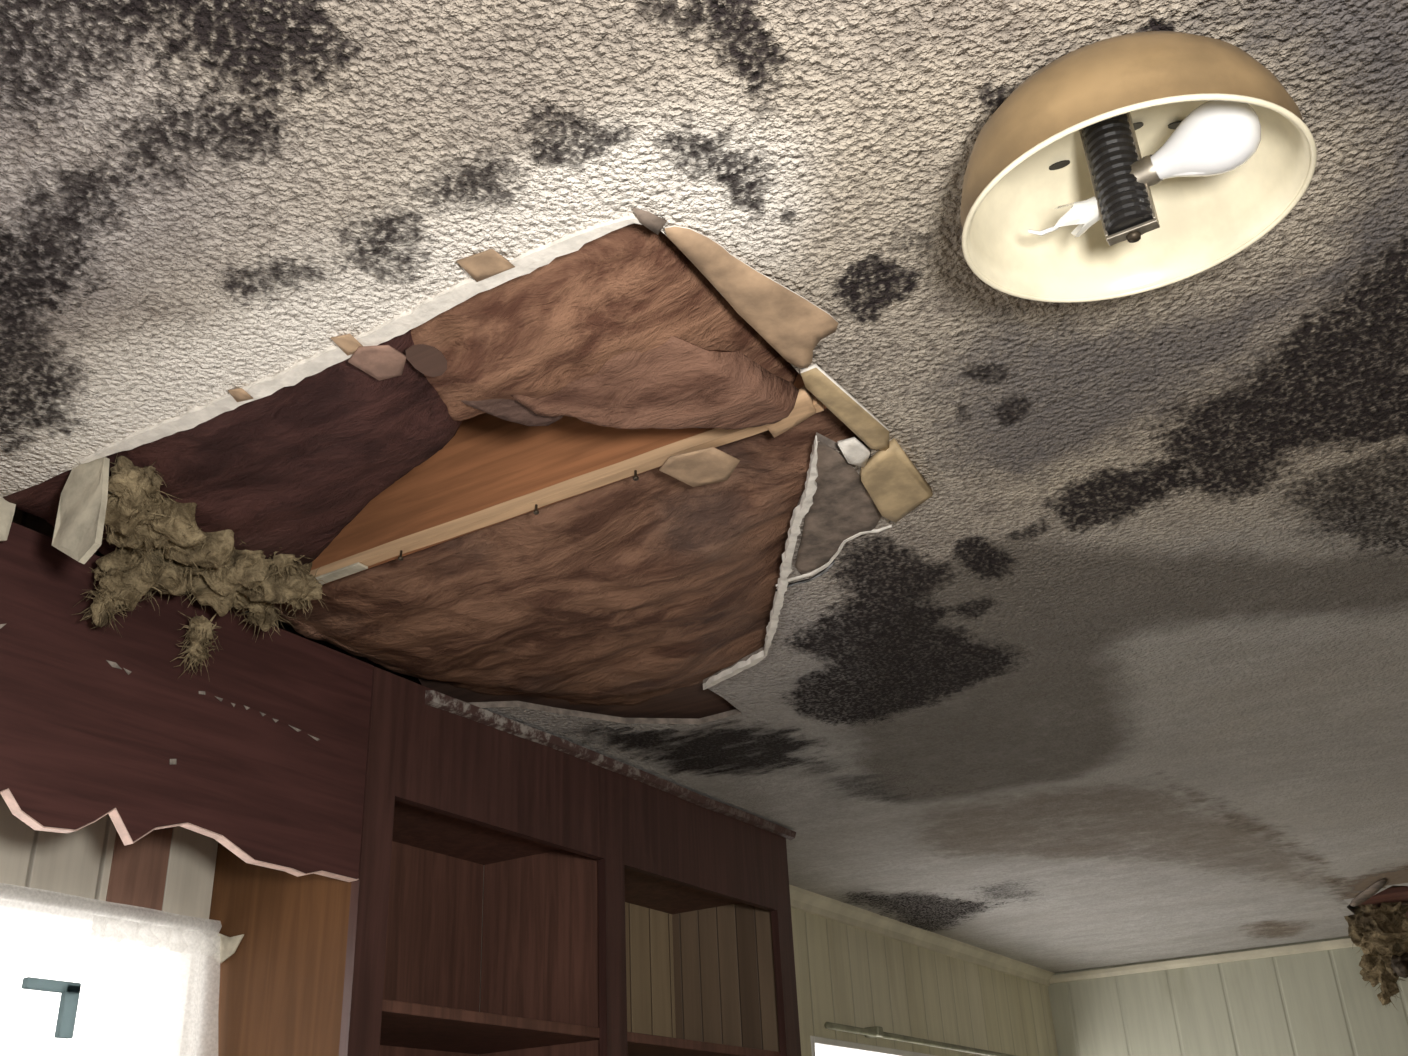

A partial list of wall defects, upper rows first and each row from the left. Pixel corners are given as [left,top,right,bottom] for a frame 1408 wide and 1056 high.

damp [643,0,787,94]
damp [980,86,1013,113]
damp [1138,19,1174,32]
damp [1275,0,1408,109]
damp [0,0,360,453]
damp [340,151,520,283]
damp [658,128,773,220]
spalling [52,207,667,564]
peeling [0,497,16,541]
peeling [703,435,882,690]
damp [783,137,1408,798]
damp [847,882,1028,932]